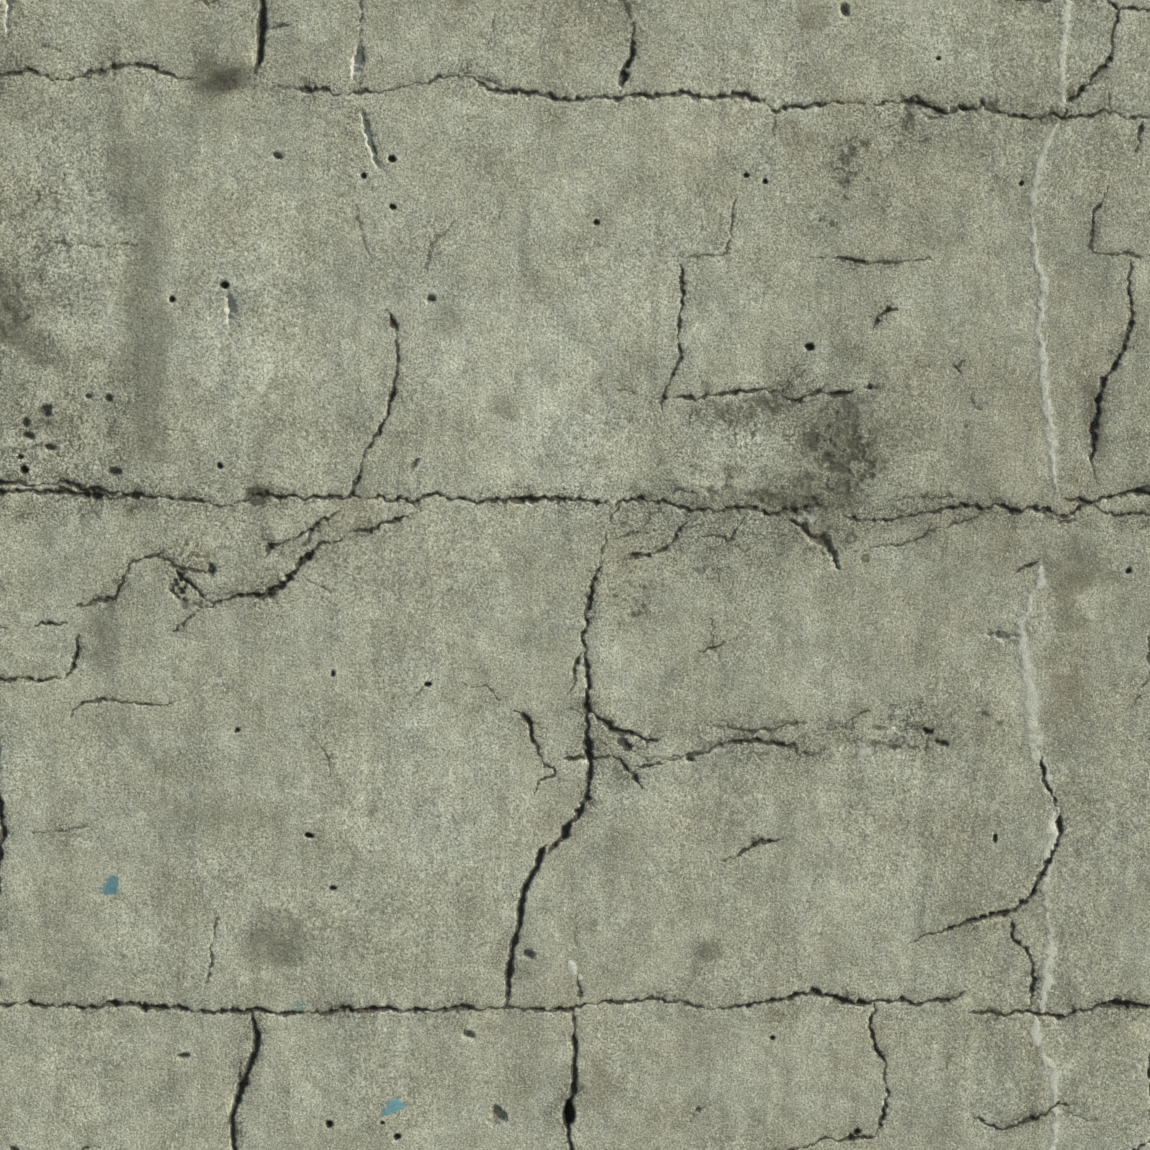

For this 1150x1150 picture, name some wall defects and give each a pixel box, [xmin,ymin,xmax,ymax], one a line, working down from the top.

crack [0,63,196,81]
crack [254,0,1150,153]
water stain [1057,0,1074,111]
crack [660,196,878,410]
crack [817,256,930,265]
crack [845,187,1150,552]
water stain [1029,124,1058,489]
crack [0,307,1150,1150]
water stain [1017,566,1060,1150]